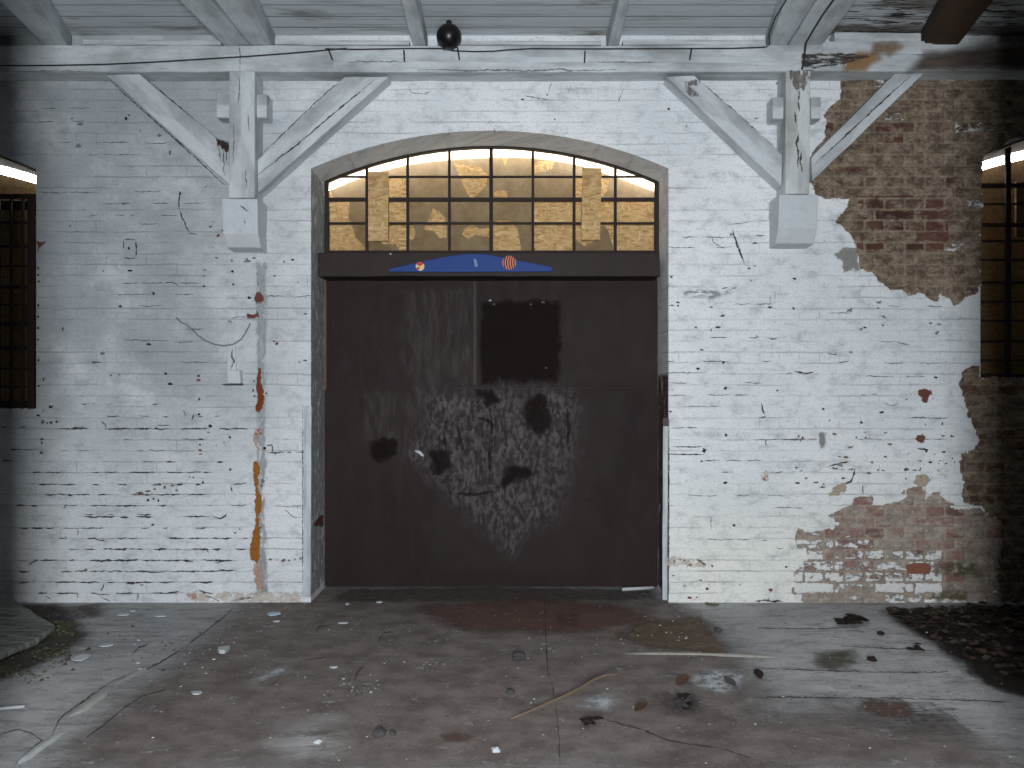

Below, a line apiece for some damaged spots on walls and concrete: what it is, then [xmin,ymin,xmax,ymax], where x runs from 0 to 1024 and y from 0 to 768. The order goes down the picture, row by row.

flaking render [790,53,886,170]
crack [42,191,196,225]
flaking render [811,80,1024,307]
rust [252,368,267,412]
rust [250,429,302,563]
flaking render [785,366,1024,603]